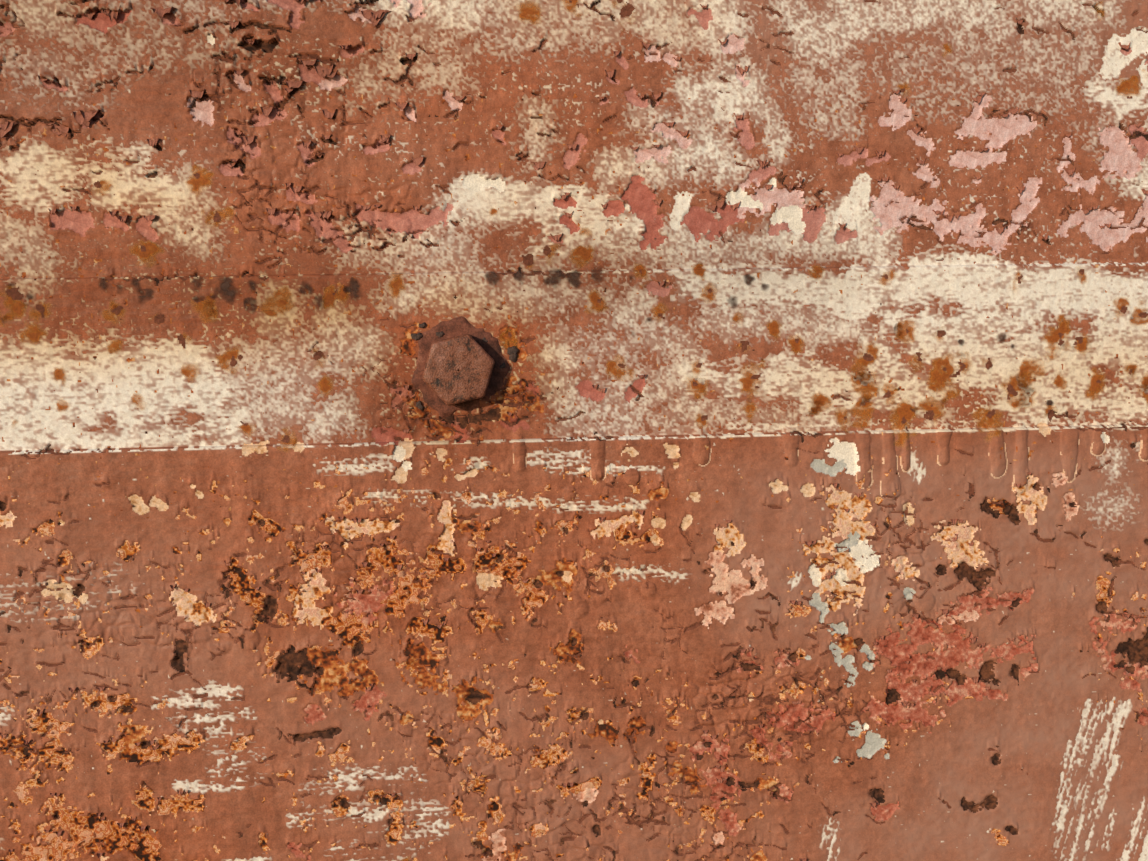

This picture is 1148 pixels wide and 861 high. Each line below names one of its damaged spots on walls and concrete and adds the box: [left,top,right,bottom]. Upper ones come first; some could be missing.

peeling [0,0,1148,533]
rust [154,262,471,403]
rust [1105,290,1148,325]
peeling [650,518,666,546]
rust [930,519,989,570]
spalling [936,561,996,591]
rust [169,585,217,627]
rust [250,485,577,726]
peeling [808,531,881,687]
spalling [945,661,1020,686]
spalling [1113,627,1148,674]
rust [0,687,205,773]